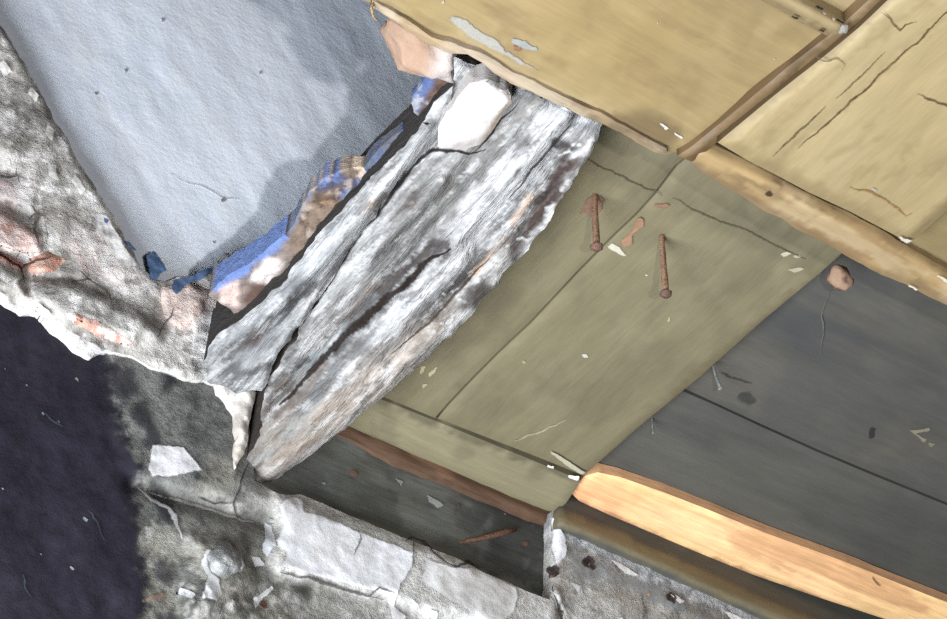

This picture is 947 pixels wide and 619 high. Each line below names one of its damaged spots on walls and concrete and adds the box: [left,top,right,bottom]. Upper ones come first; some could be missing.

flaking render [0,61,11,77]
crack [774,12,947,155]
crack [0,168,20,182]
flaking render [48,163,59,180]
flaking render [71,175,85,194]
crack [0,191,50,282]
spalling [0,211,68,273]
crack [72,271,113,303]
crack [406,536,480,568]
crack [552,586,563,619]